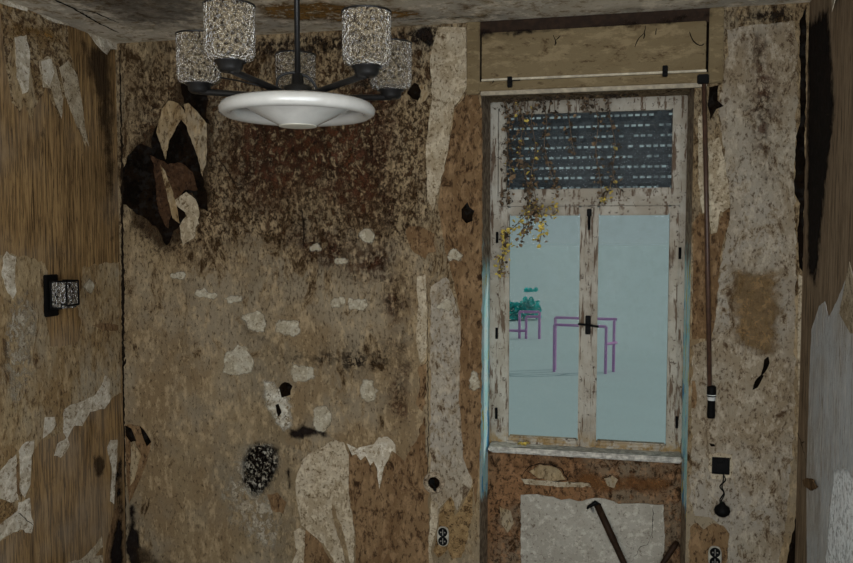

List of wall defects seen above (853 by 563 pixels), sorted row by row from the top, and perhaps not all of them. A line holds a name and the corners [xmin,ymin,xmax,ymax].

water stain [257,1,349,27]
peeling [15,35,30,94]
peeling [41,59,54,86]
spalling [122,83,210,246]
water stain [130,9,436,280]
flaking render [348,95,483,563]
water stain [264,381,292,430]
water stain [224,443,287,548]
flaking render [104,502,124,563]
flaking render [292,527,333,563]